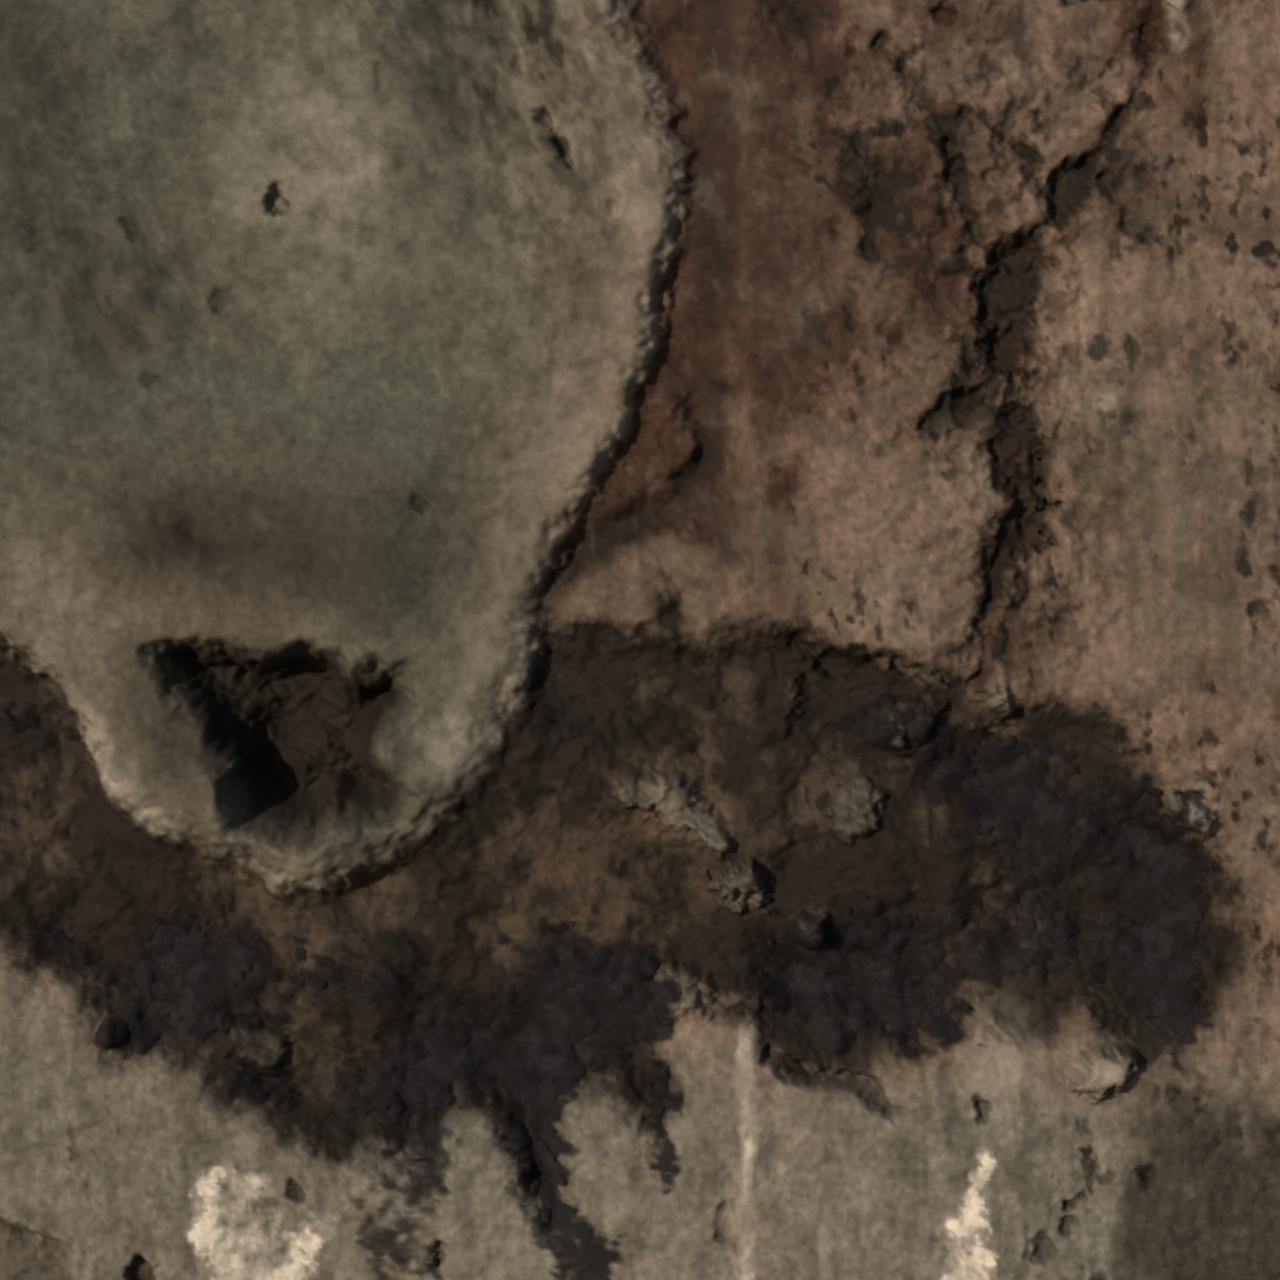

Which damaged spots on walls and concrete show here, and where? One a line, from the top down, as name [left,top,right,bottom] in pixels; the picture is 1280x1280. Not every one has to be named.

peeling [763,0,841,56]
crack [849,136,890,265]
spalling [537,0,737,596]
crack [890,0,1167,611]
crack [968,645,993,701]
spalling [0,559,1251,1167]
damp [735,693,1228,1058]
damp [93,903,682,1280]
spalling [286,1178,305,1204]
damp [941,1151,997,1280]
spalling [1024,1191,1086,1268]
damp [1122,1114,1280,1280]